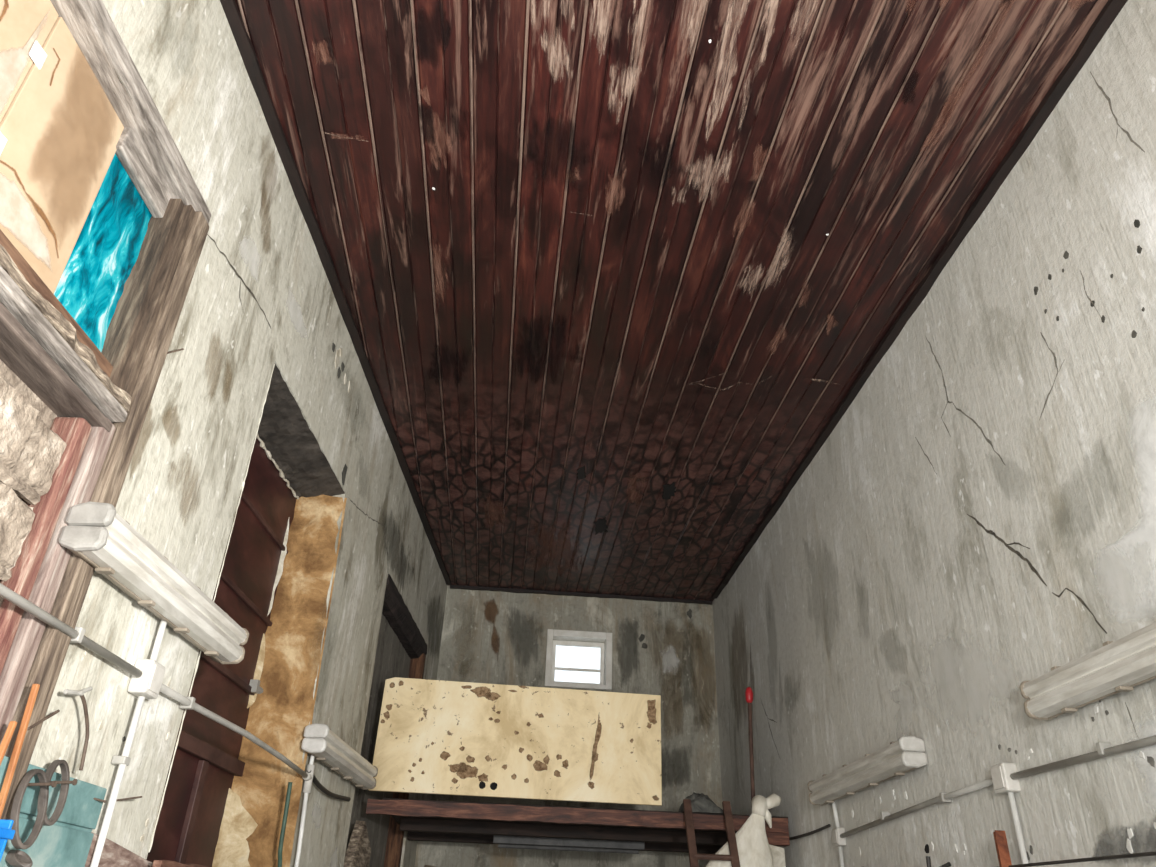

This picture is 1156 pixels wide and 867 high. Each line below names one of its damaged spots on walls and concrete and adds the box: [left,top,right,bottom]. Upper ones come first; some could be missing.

peeling [541,15,575,80]
peeling [608,0,647,124]
peeling [706,0,749,138]
peeling [790,0,818,47]
crack [1090,72,1145,152]
peeling [434,247,449,299]
peeling [740,265,765,292]
crack [926,338,1005,465]
crack [967,514,1107,634]